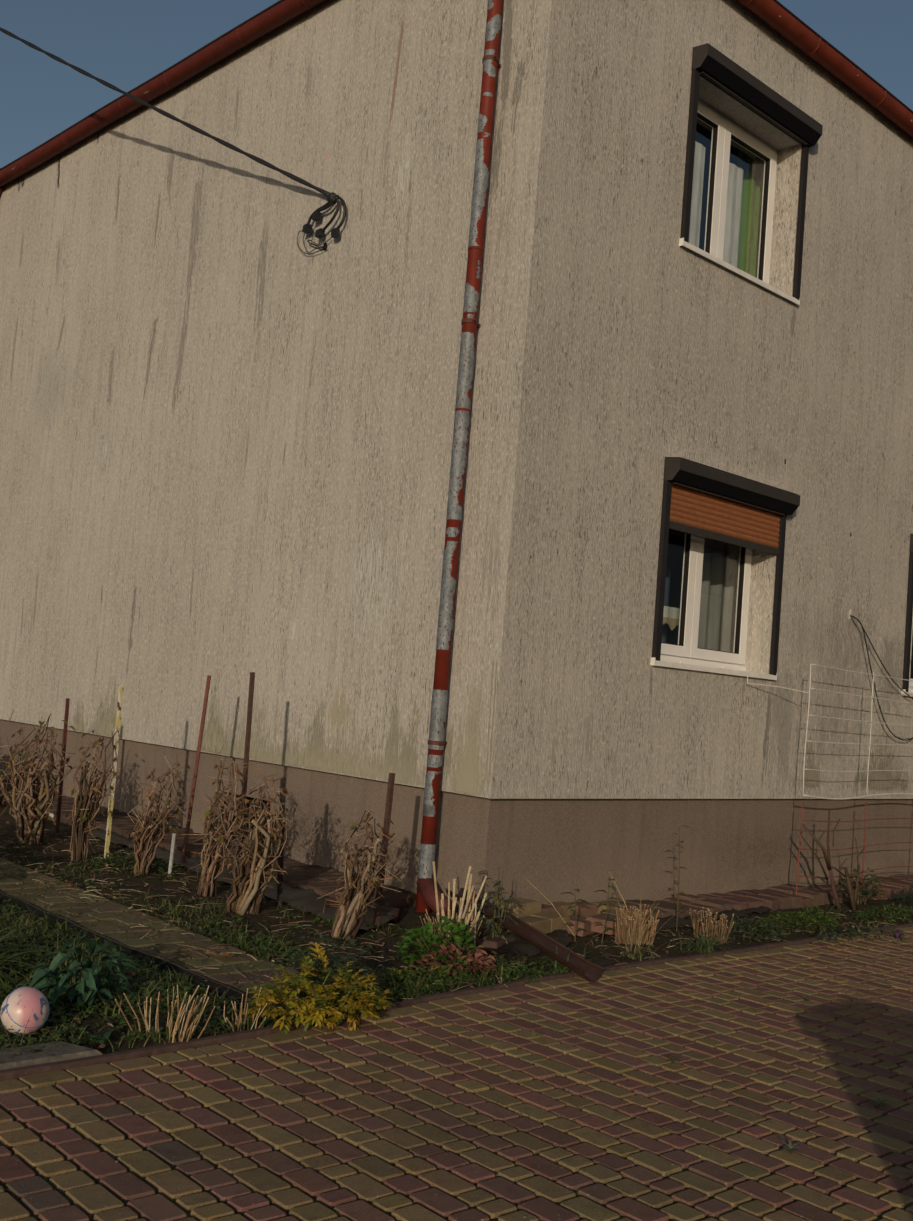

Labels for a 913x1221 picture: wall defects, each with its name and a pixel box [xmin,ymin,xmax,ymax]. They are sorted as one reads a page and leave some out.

peeling [483,0,502,77]
water stain [172,166,203,415]
peeling [436,114,490,650]
peeling [423,689,448,817]
water stain [761,596,905,797]
peeling [418,843,436,879]